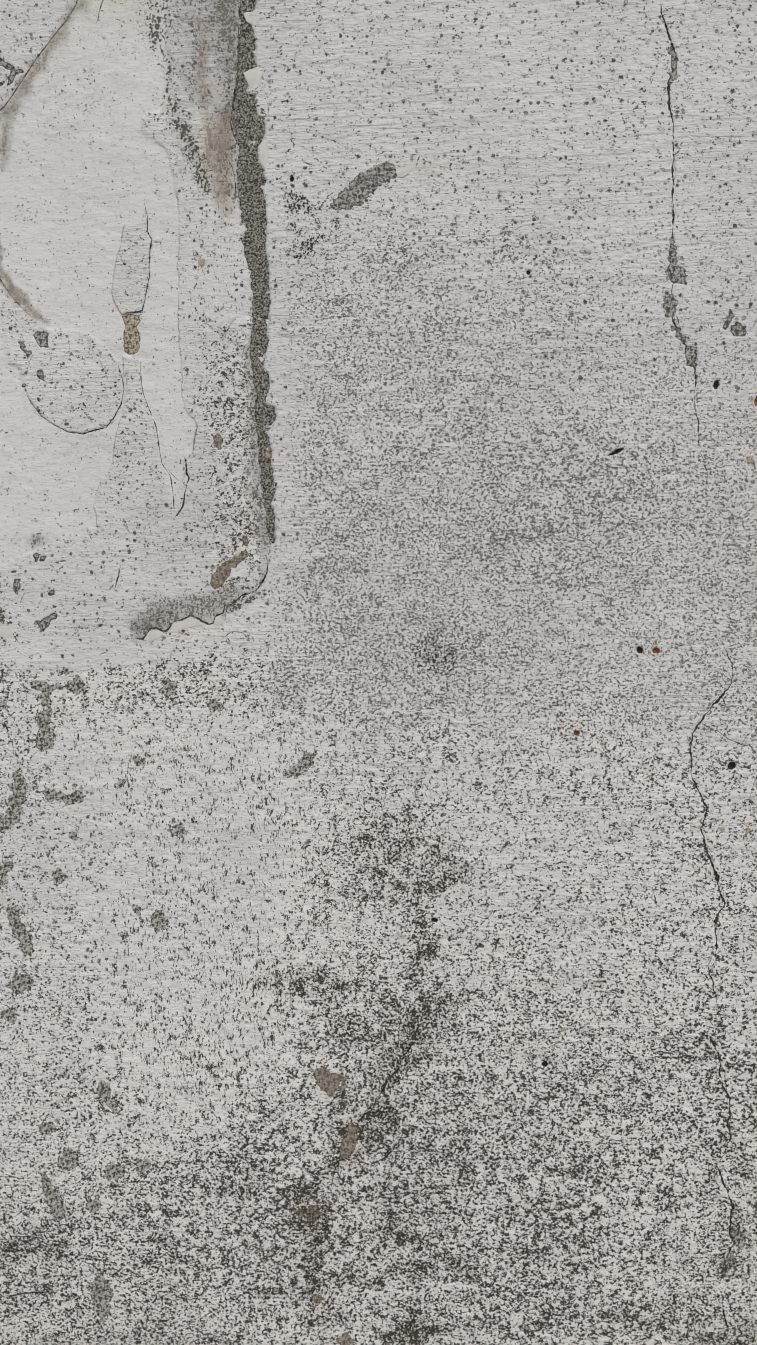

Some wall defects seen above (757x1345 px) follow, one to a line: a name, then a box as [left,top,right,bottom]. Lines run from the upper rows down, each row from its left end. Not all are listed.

spalling [0,57,24,87]
crack [0,0,103,111]
damp [136,0,245,203]
crack [220,8,240,193]
crack [127,203,152,313]
spalling [231,0,276,543]
crack [660,3,708,493]
spalling [18,331,49,387]
spalling [122,313,140,355]
spalling [210,536,249,589]
spalling [36,613,58,632]
crack [689,651,747,1331]